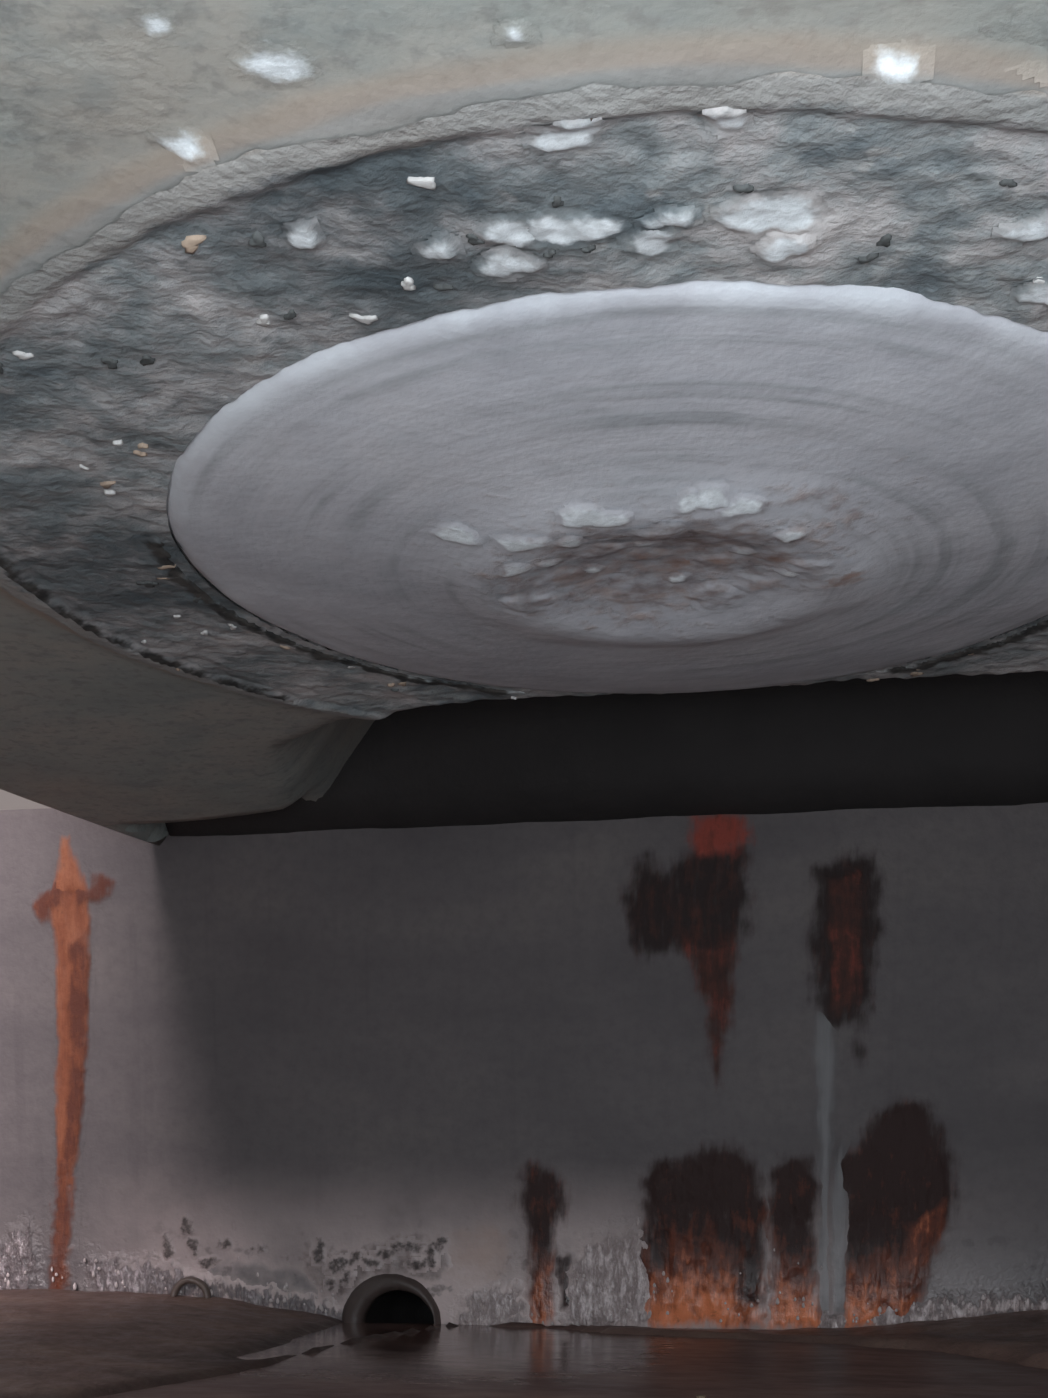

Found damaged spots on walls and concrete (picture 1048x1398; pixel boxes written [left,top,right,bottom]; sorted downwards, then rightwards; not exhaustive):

damp [520,117,617,157]
damp [276,217,329,253]
damp [409,189,828,283]
spalling [0,71,1048,720]
crack [0,541,305,702]
crack [131,531,525,698]
rust [605,814,768,1096]
rust [28,830,121,1290]
damp [0,1210,344,1321]
rust [501,1146,582,1326]
rust [620,1128,823,1330]
rust [841,1082,976,1328]